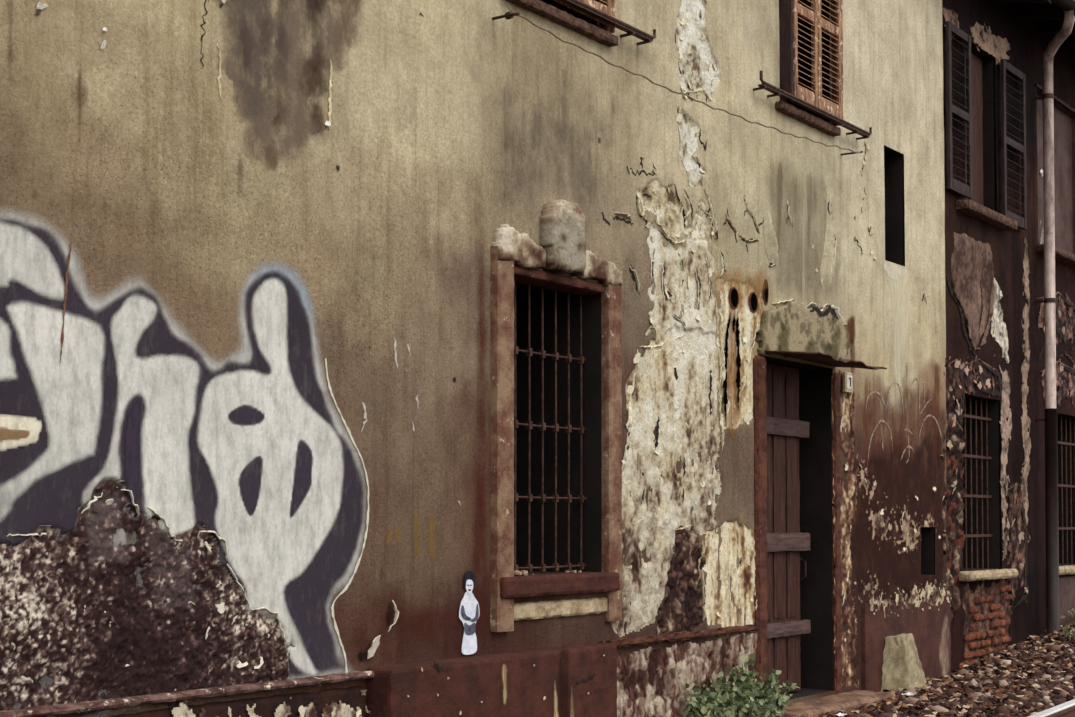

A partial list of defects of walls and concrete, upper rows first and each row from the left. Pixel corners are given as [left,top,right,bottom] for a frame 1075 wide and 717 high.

water stain [226,0,359,168]
flaking render [602,0,793,642]
rust [717,278,742,434]
peeling [805,302,844,323]
peeling [831,232,1075,688]
flaking render [0,479,293,717]
peeling [274,689,371,717]